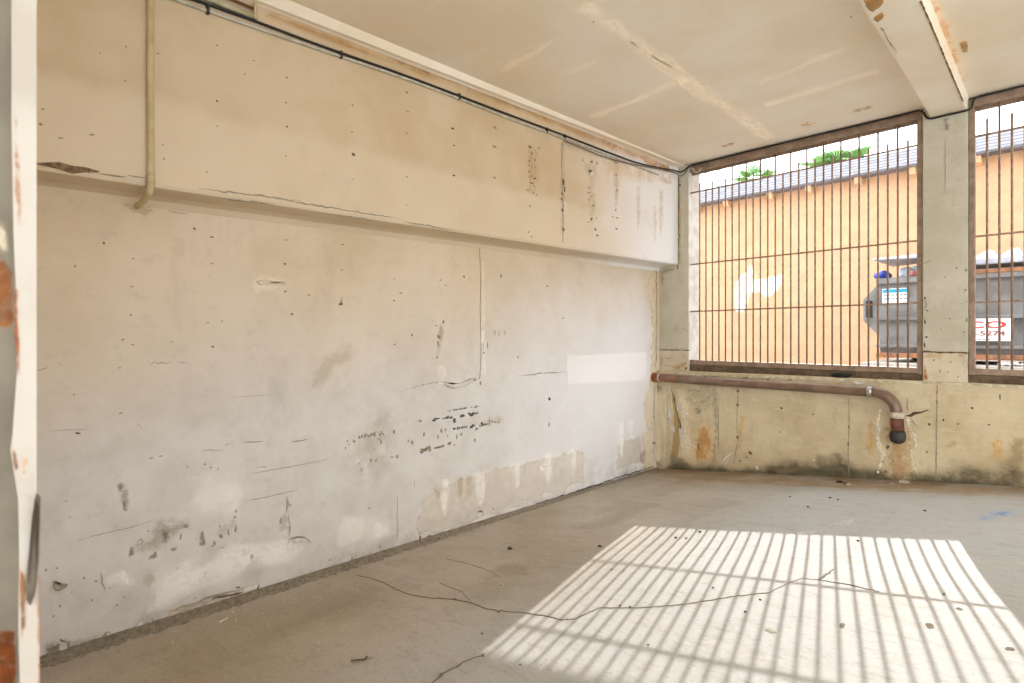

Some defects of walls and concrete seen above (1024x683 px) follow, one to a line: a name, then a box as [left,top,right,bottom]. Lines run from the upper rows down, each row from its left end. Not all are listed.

crack [559,140,567,242]
corrosion [0,262,19,366]
crack [521,177,690,509]
spalling [671,389,682,457]
damp [667,396,1017,486]
crack [906,385,938,477]
crack [357,558,879,621]